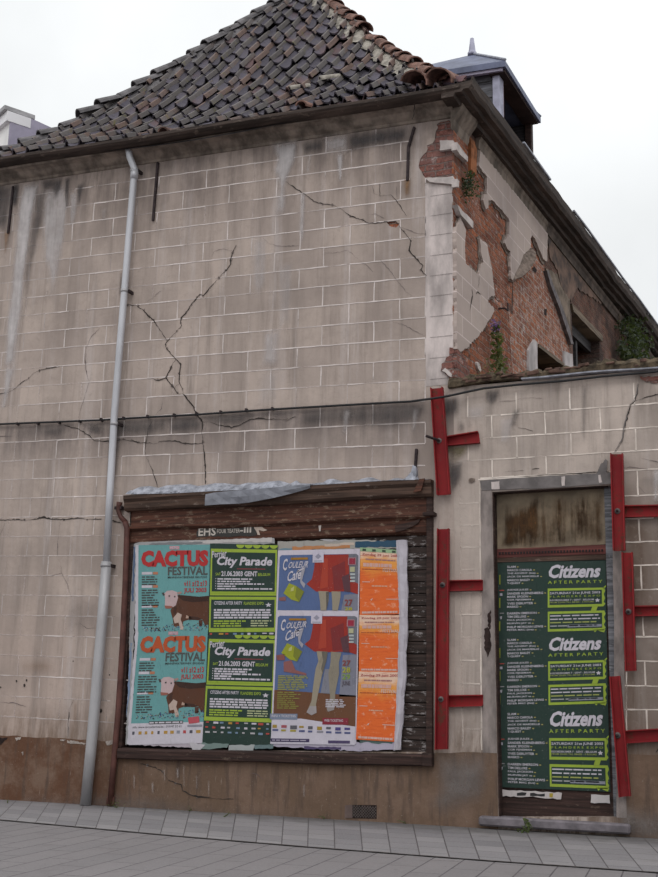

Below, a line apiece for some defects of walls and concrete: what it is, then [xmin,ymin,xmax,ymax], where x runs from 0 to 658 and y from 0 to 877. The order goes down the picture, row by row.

water stain [0,179,82,388]
crack [64,246,296,484]
crack [288,183,426,275]
spalling [419,121,570,379]
crack [615,383,658,493]
crack [0,516,120,589]